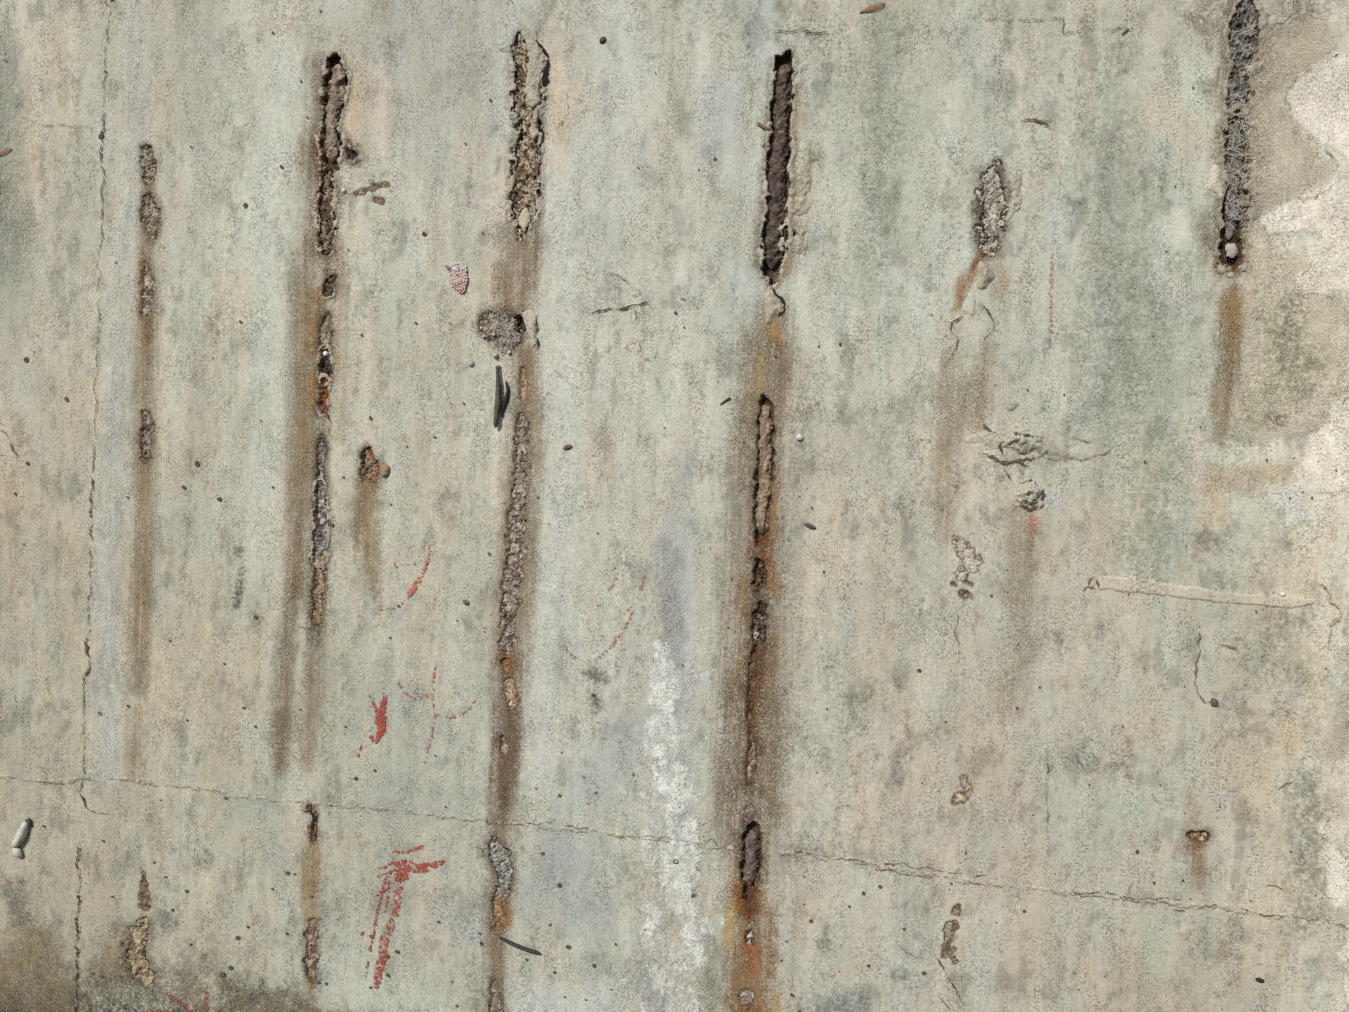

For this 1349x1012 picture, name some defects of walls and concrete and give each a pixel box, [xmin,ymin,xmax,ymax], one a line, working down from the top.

spalling [315,54,360,256]
spalling [508,32,543,241]
spalling [761,50,796,286]
peeling [1217,0,1349,298]
crack [0,0,745,856]
corrosion [1199,209,1256,438]
peeling [1266,395,1349,526]
corrosion [487,344,540,1008]
corrosion [718,301,793,1012]
crack [74,843,83,1012]
water stain [1,950,316,1012]
crack [760,849,1349,930]